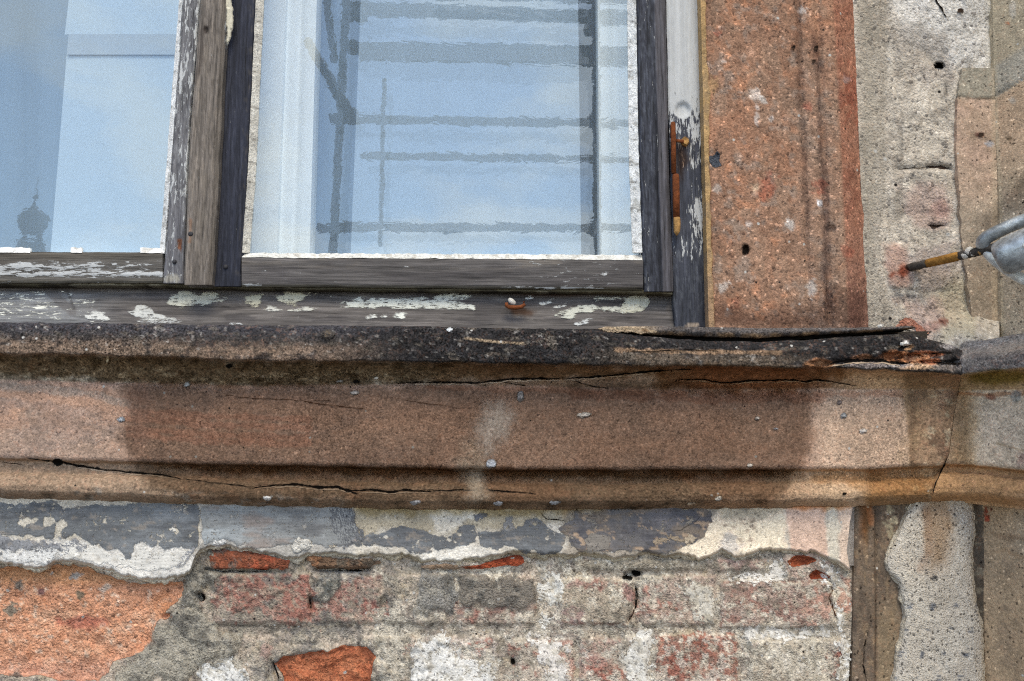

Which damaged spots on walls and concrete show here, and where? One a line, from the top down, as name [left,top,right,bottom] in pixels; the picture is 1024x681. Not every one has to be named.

peeling [85,311,110,320]
peeling [129,291,228,323]
peeling [244,291,316,311]
peeling [342,293,475,319]
peeling [526,295,650,326]
crack [230,330,961,409]
spalling [882,352,931,363]
crack [4,458,564,521]
spalling [788,555,830,579]
spalling [0,500,712,681]